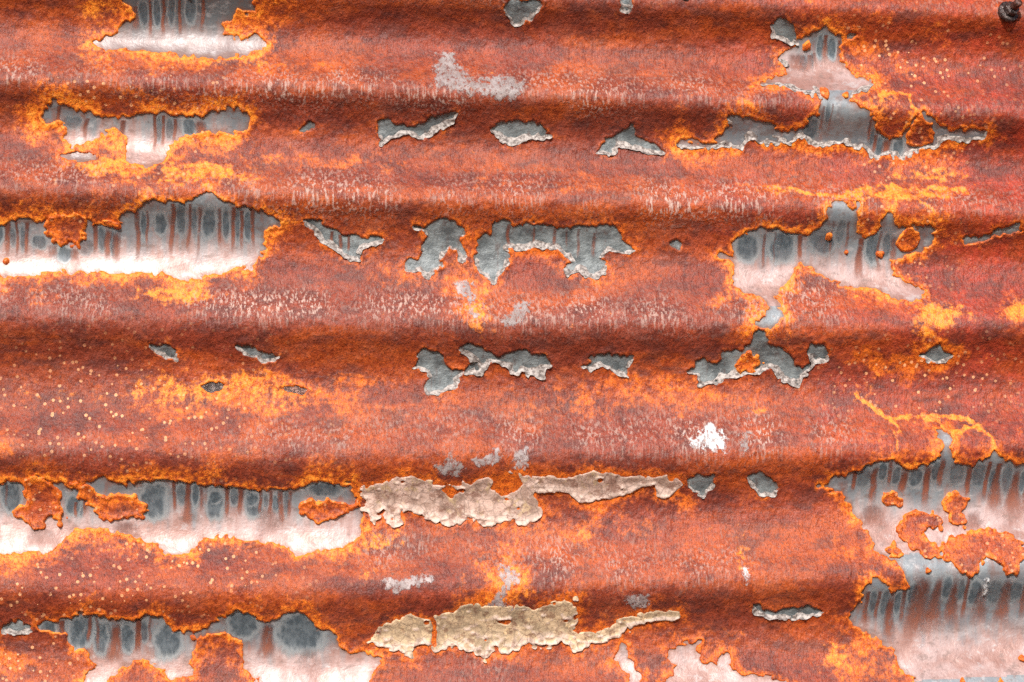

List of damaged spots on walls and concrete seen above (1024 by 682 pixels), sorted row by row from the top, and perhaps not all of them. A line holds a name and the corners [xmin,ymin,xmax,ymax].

peeling [93,0,266,60]
peeling [42,98,250,168]
peeling [490,120,553,146]
peeling [676,17,987,160]
peeling [0,192,281,281]
peeling [303,219,384,262]
peeling [405,217,636,318]
peeling [686,200,936,388]
peeling [412,343,552,396]
peeling [0,446,715,557]
peeling [816,429,1024,682]
peeling [1,594,680,682]